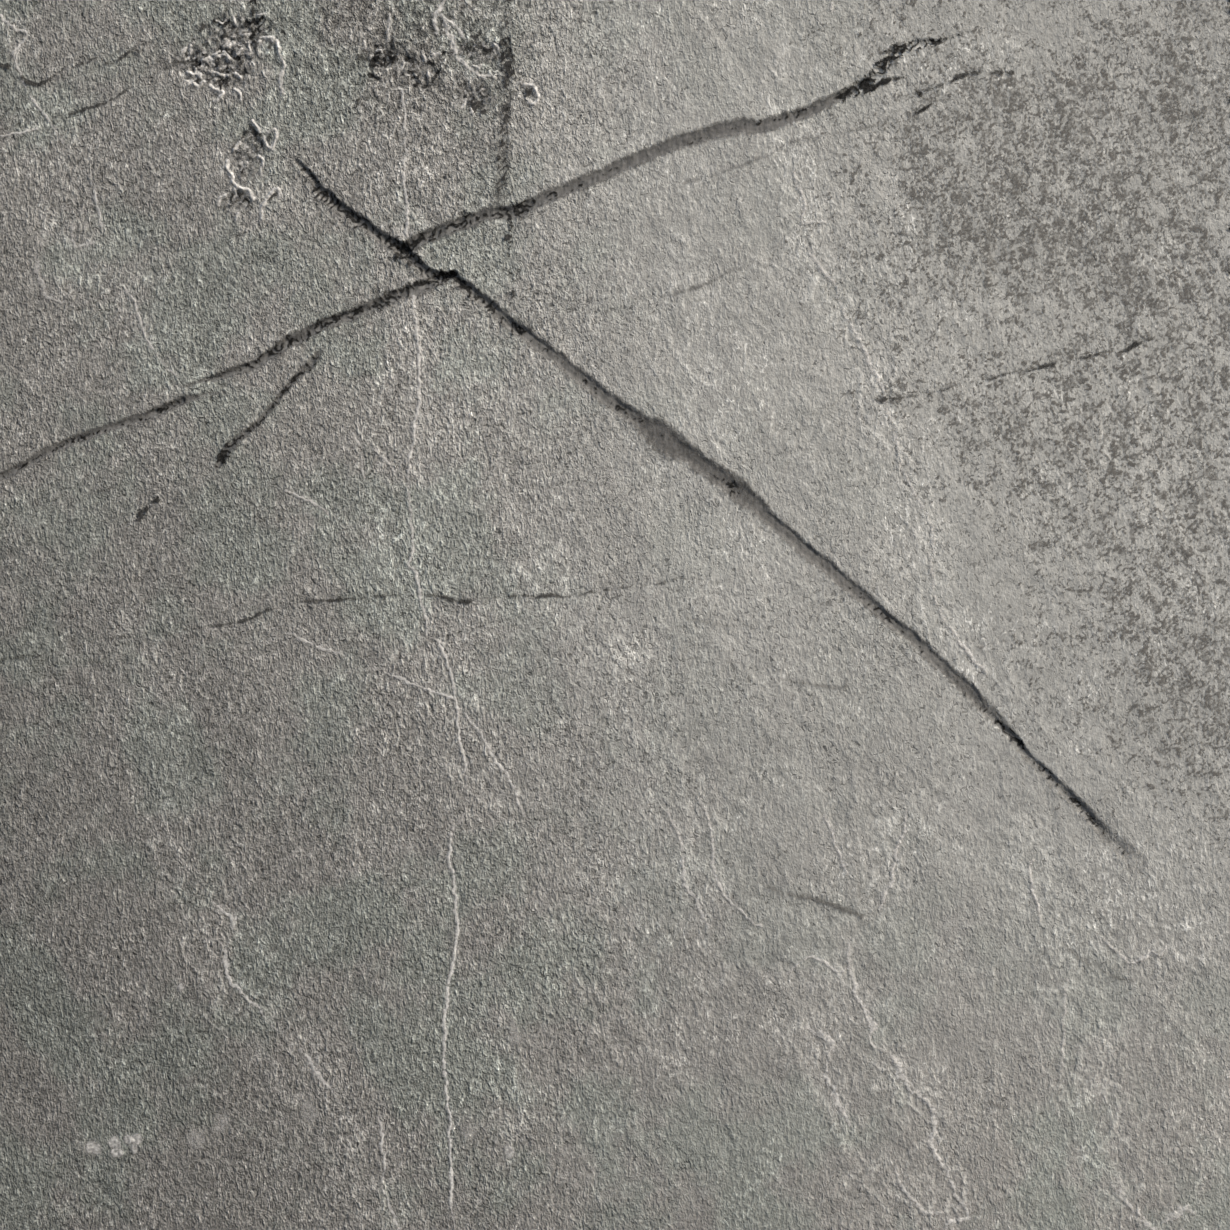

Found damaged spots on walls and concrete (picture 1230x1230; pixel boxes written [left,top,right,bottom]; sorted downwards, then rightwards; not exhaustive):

crack [0,0,1143,855]